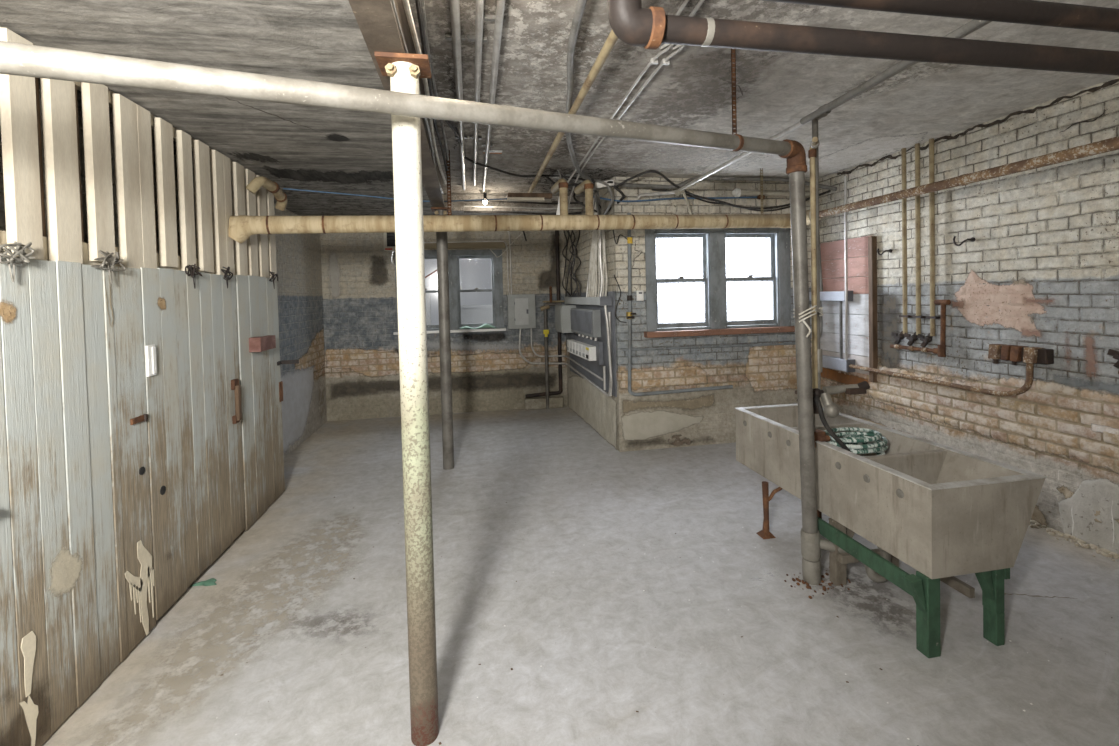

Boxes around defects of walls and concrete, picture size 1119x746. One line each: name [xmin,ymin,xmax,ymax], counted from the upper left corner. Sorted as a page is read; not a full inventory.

peeling [0,302,17,323]
peeling [952,269,1054,337]
peeling [745,342,797,392]
peeling [821,363,1119,474]